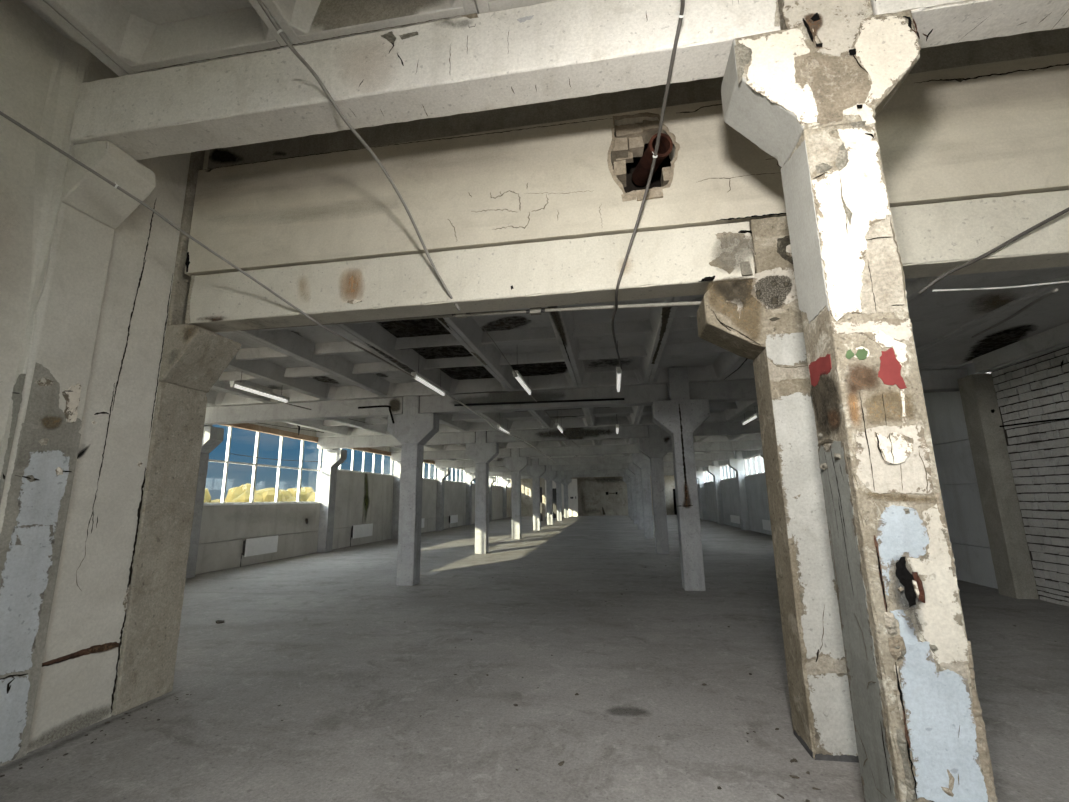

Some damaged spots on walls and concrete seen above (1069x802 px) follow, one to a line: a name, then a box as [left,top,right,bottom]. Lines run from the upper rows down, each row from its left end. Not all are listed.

crack [448,183,602,242]
spalling [607,112,680,202]
peeling [698,0,921,381]
crack [76,200,156,591]
crack [150,275,173,432]
damp [810,375,840,436]
peeling [0,362,82,767]
corrosion [42,642,119,667]
crack [111,467,146,713]
peeling [772,392,998,802]